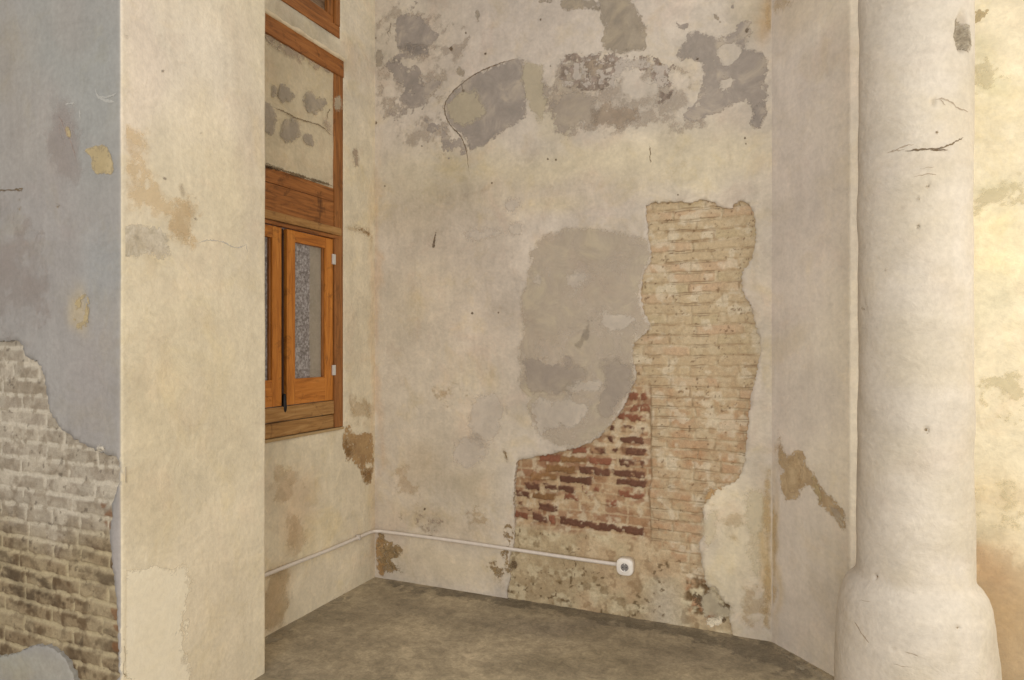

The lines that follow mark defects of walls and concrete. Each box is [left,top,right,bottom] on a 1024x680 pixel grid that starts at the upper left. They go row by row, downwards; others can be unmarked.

peeling [85,145,113,174]
crack [444,57,520,173]
peeling [376,0,769,159]
crack [888,137,963,177]
spalling [953,9,989,52]
flaking render [503,200,761,635]
flaking render [0,340,126,680]